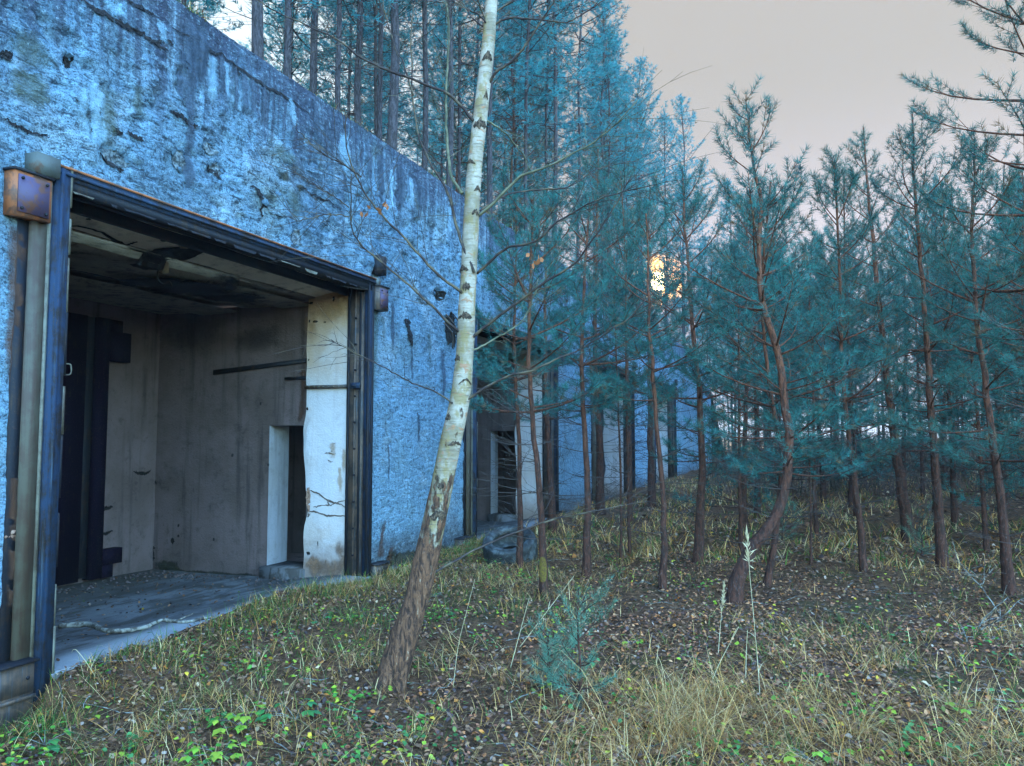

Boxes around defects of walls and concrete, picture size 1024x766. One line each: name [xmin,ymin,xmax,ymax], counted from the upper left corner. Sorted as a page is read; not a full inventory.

damp [177,24,210,186]
damp [367,146,404,211]
crack [307,490,345,517]